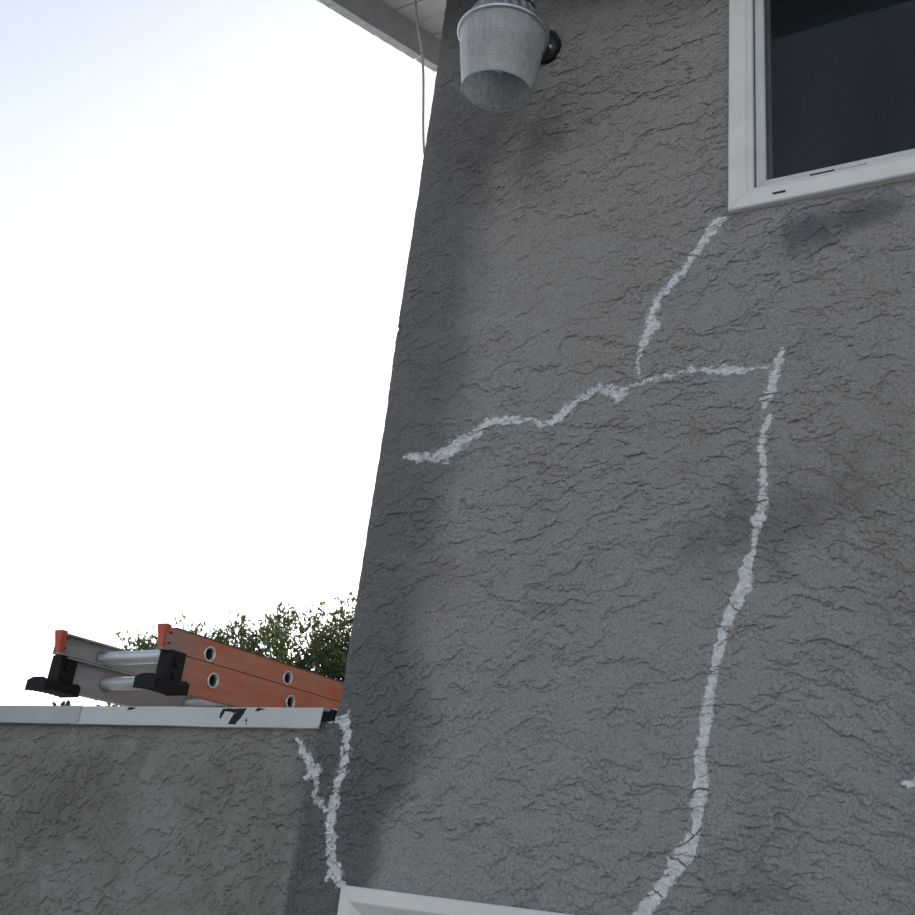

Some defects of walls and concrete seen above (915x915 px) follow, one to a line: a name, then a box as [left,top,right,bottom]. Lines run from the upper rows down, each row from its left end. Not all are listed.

crack [403,216,786,915]
crack [295,707,352,888]
crack [901,778,915,789]